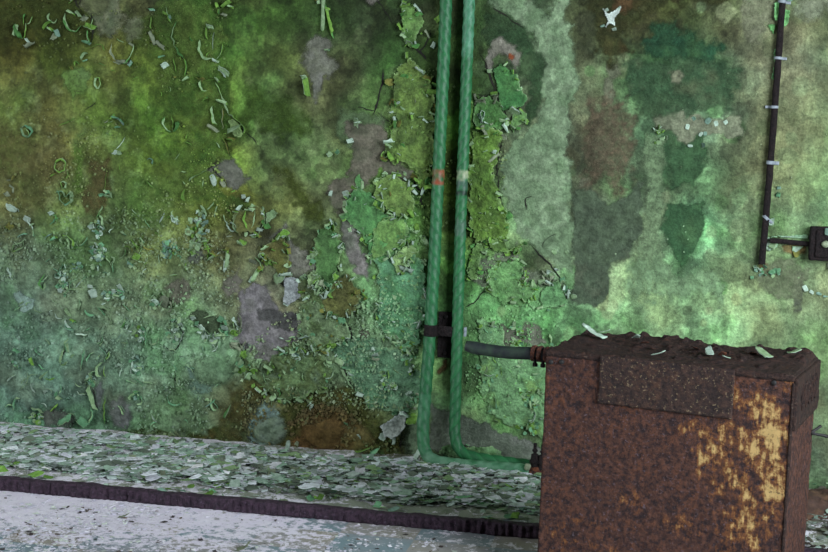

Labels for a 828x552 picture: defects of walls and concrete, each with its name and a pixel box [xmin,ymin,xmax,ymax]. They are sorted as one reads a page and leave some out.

peeling [0,0,437,432]
peeling [466,37,577,347]
spalling [429,404,460,458]
peeling [460,355,546,460]